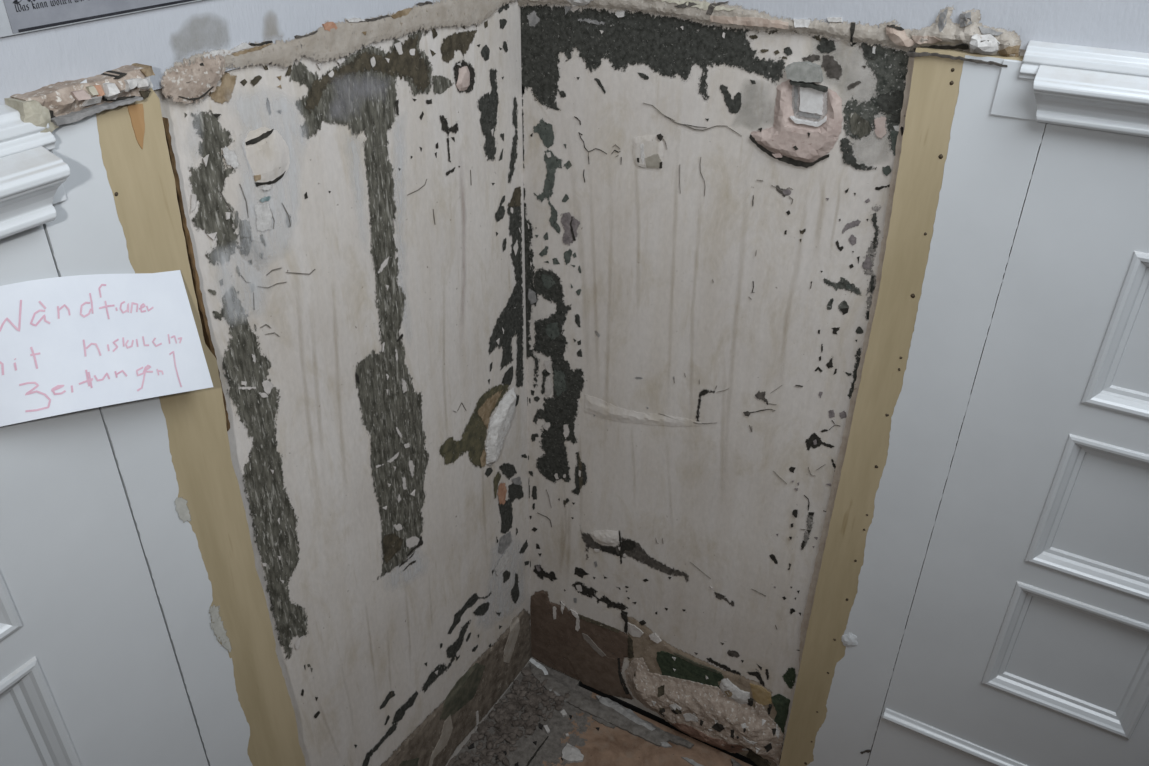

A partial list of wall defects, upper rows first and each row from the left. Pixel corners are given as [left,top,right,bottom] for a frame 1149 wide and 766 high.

peeling [4,0,1021,661]
peeling [782,667,797,689]